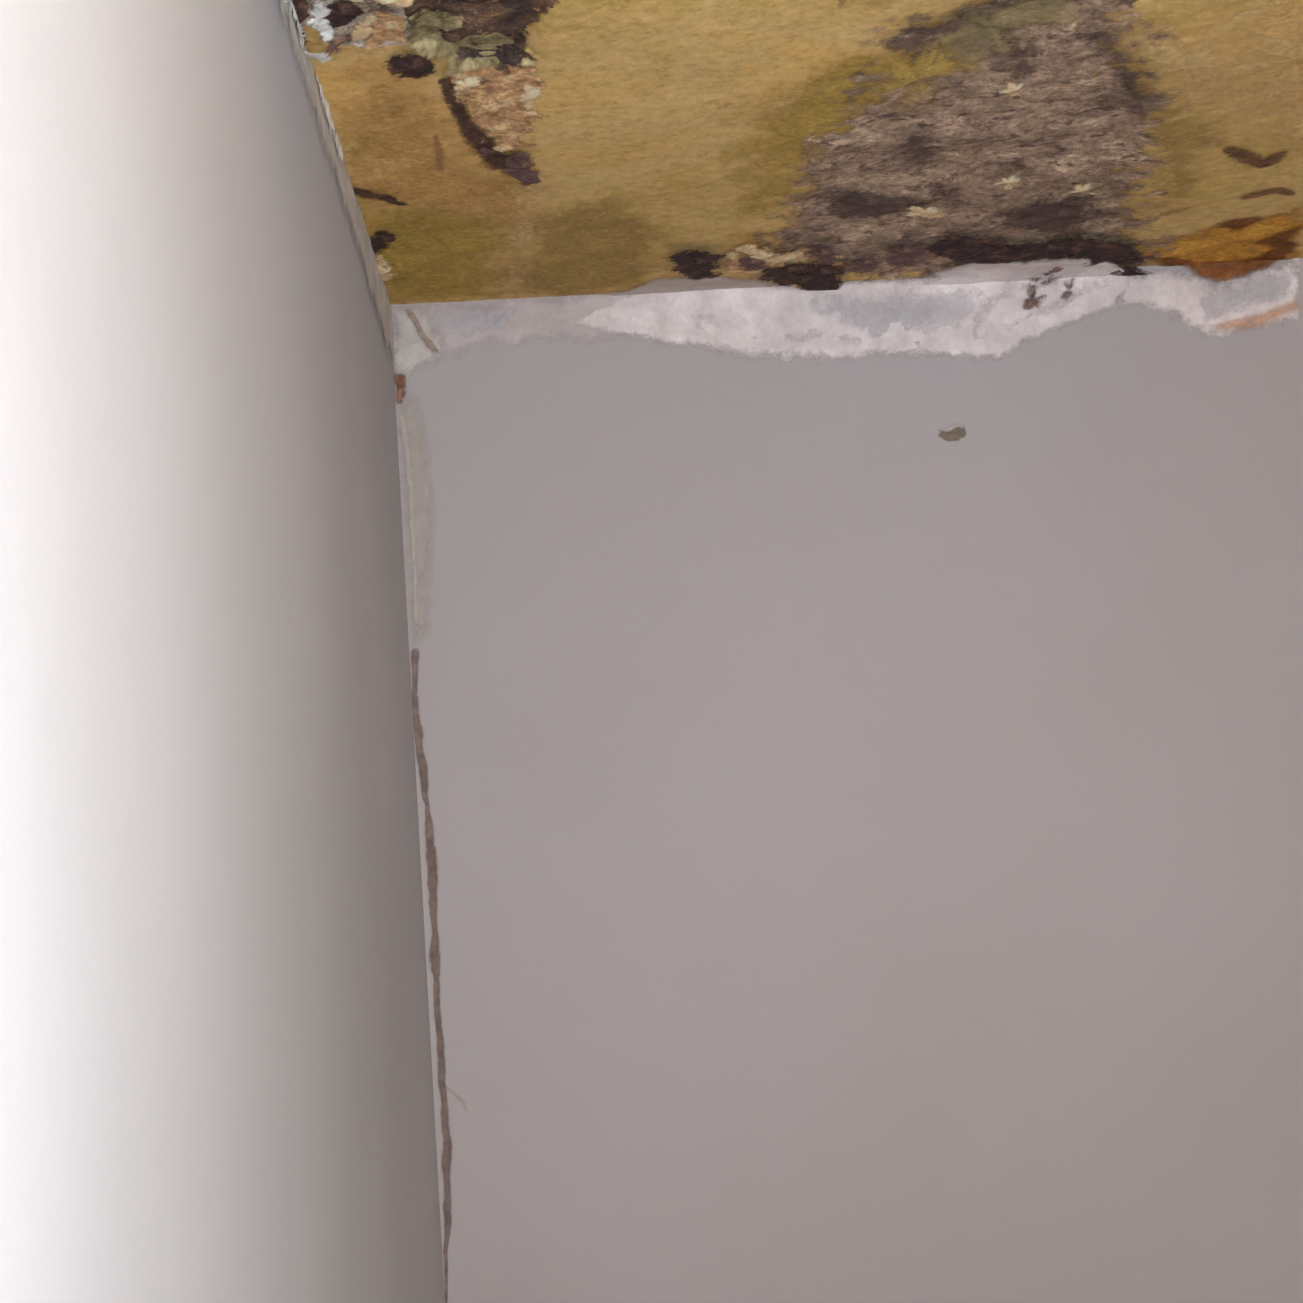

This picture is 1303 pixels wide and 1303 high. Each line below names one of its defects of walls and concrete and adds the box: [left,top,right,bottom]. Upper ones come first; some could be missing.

peeling [280,0,1300,361]
damp [737,0,1217,282]
corrosion [1144,213,1303,281]
crack [411,649,466,1303]